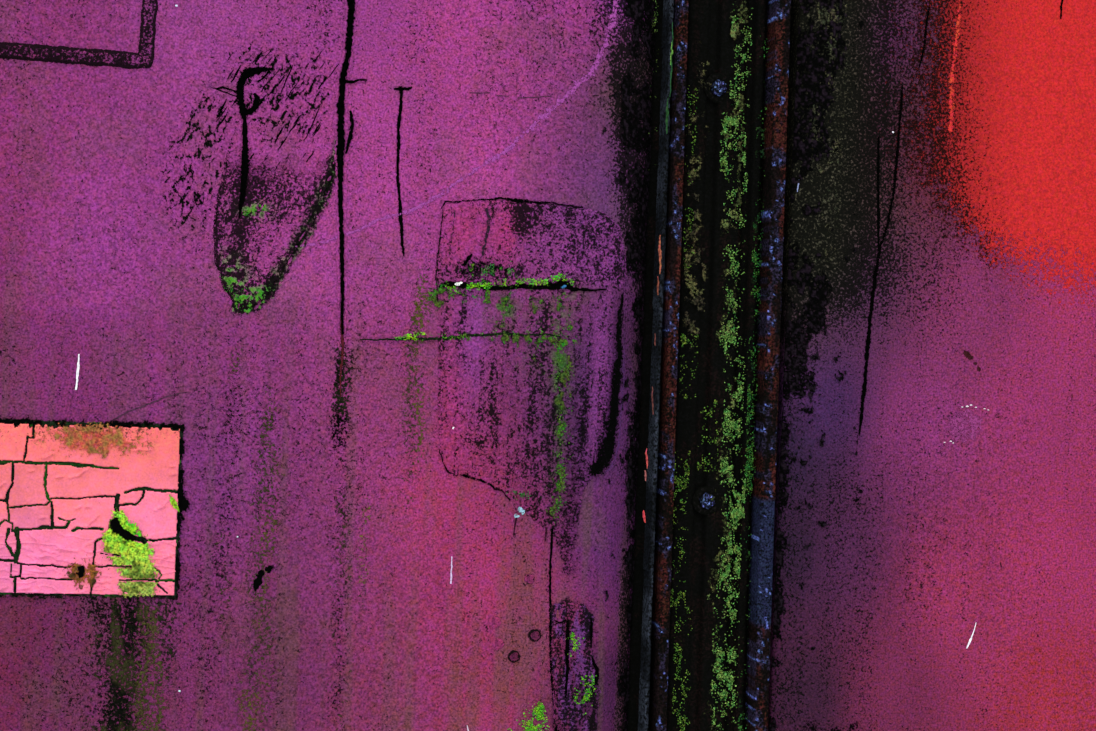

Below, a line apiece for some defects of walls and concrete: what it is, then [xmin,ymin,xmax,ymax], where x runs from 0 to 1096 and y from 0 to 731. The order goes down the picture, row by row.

crack [0,423,181,598]
leakage [74,597,188,731]